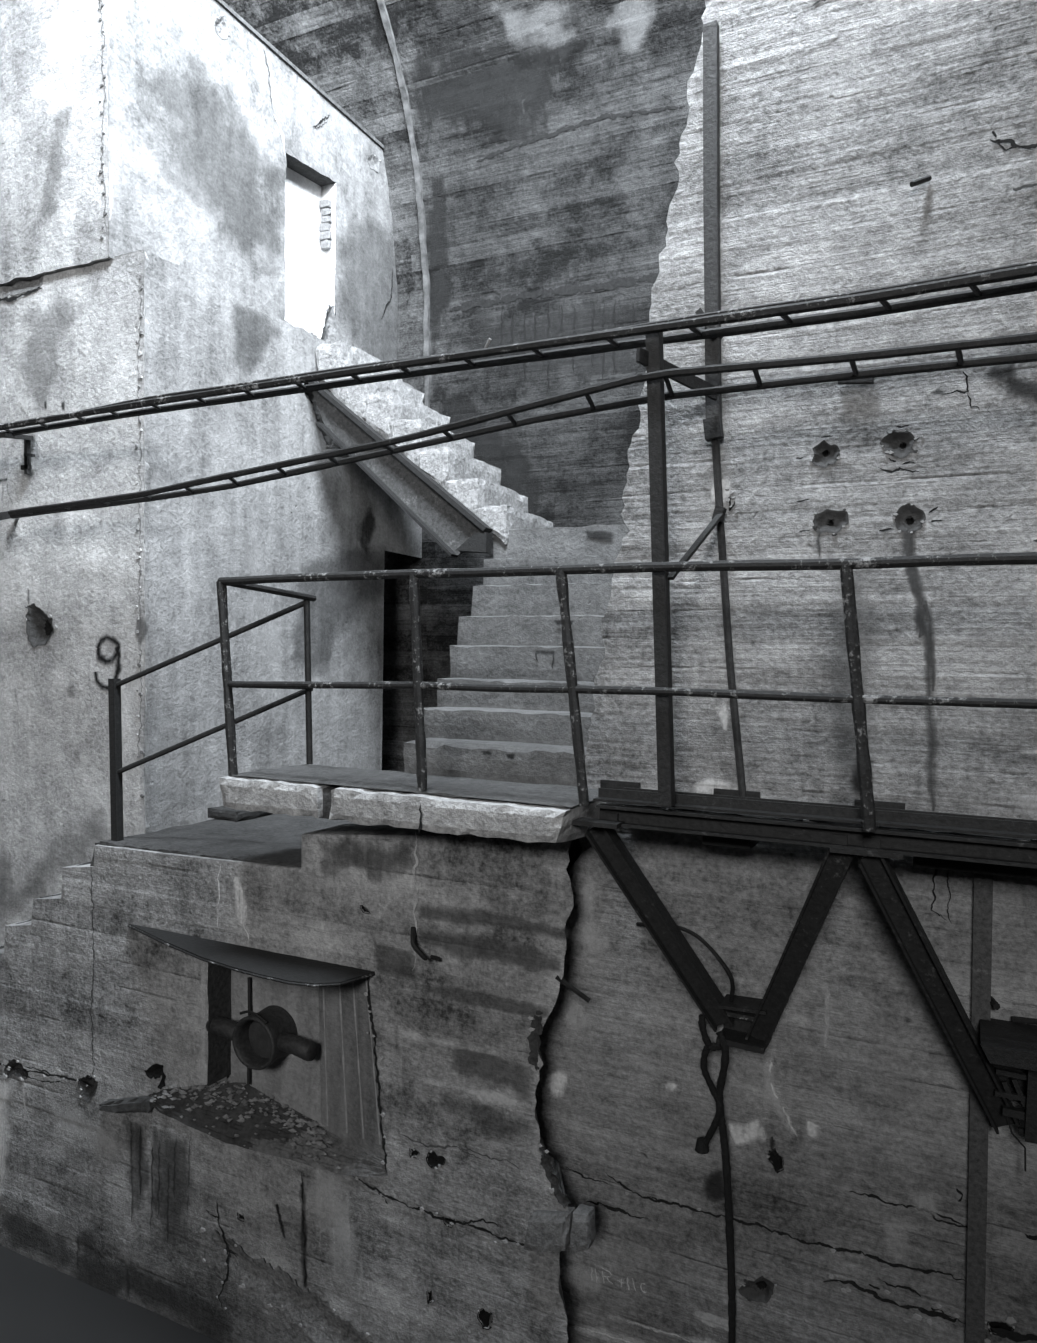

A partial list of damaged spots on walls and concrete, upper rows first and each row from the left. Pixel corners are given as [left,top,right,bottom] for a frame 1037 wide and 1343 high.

spalling [796,435,840,468]
spalling [879,425,923,465]
spalling [796,499,849,556]
spalling [879,503,942,533]
spalling [25,590,58,649]
leakage [0,1080,26,1183]
leakage [131,1127,148,1222]
crack [353,977,524,1246]
crack [206,1204,239,1312]
crack [567,1167,1037,1343]